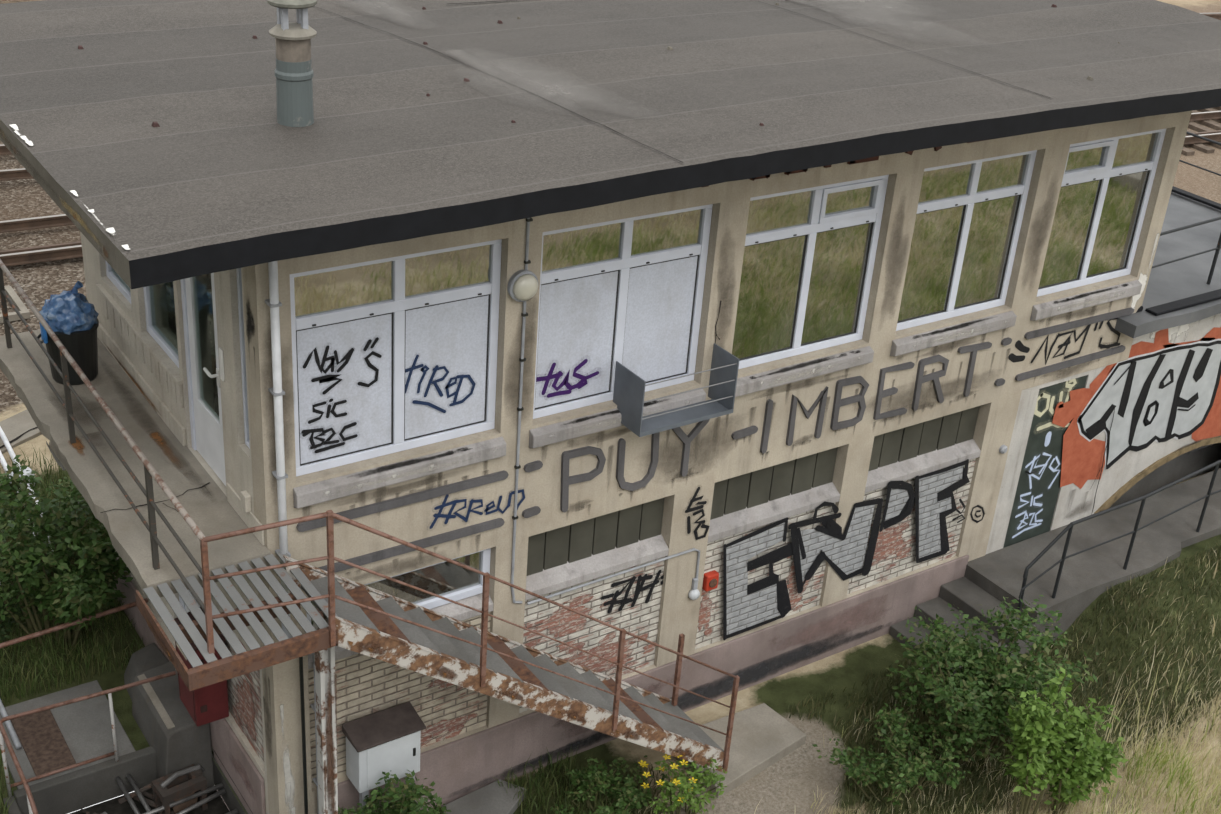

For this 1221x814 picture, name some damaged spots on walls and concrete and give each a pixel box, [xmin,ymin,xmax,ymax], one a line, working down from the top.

peeling [872,522,916,566]
peeling [786,556,818,611]
rust [348,641,385,655]
peeling [523,594,656,672]
peeling [698,589,712,636]
rust [425,667,457,679]
rust [324,674,337,814]
peeling [420,713,478,747]
rust [495,690,523,701]
rust [558,711,586,722]